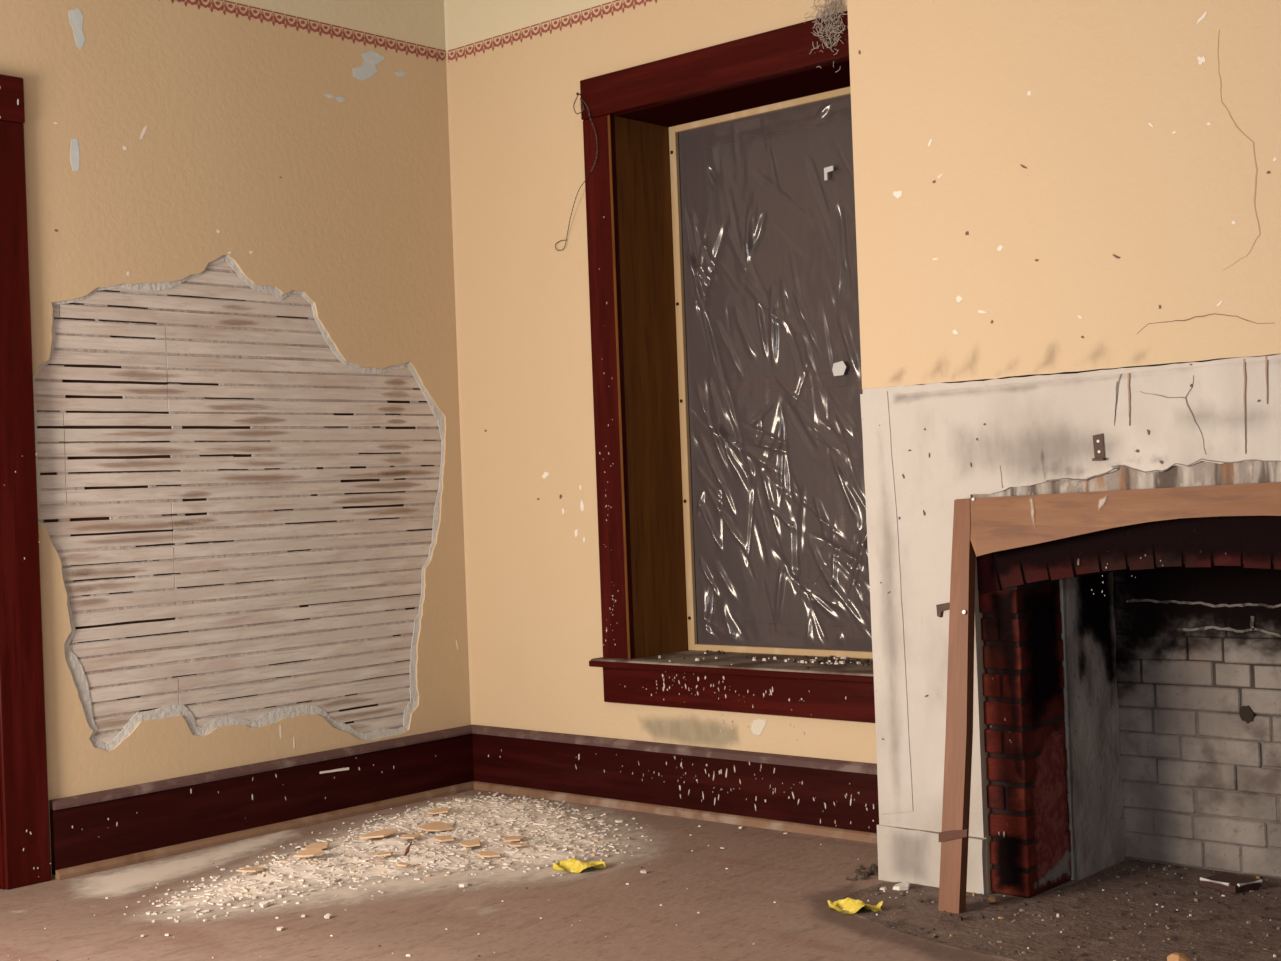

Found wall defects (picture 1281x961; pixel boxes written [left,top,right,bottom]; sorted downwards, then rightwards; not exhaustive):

peeling [69,8,85,50]
peeling [353,51,385,81]
peeling [70,138,80,171]
crack [1217,30,1261,270]
crack [1137,313,1268,334]
crack [1046,374,1281,482]
spalling [33,251,445,751]